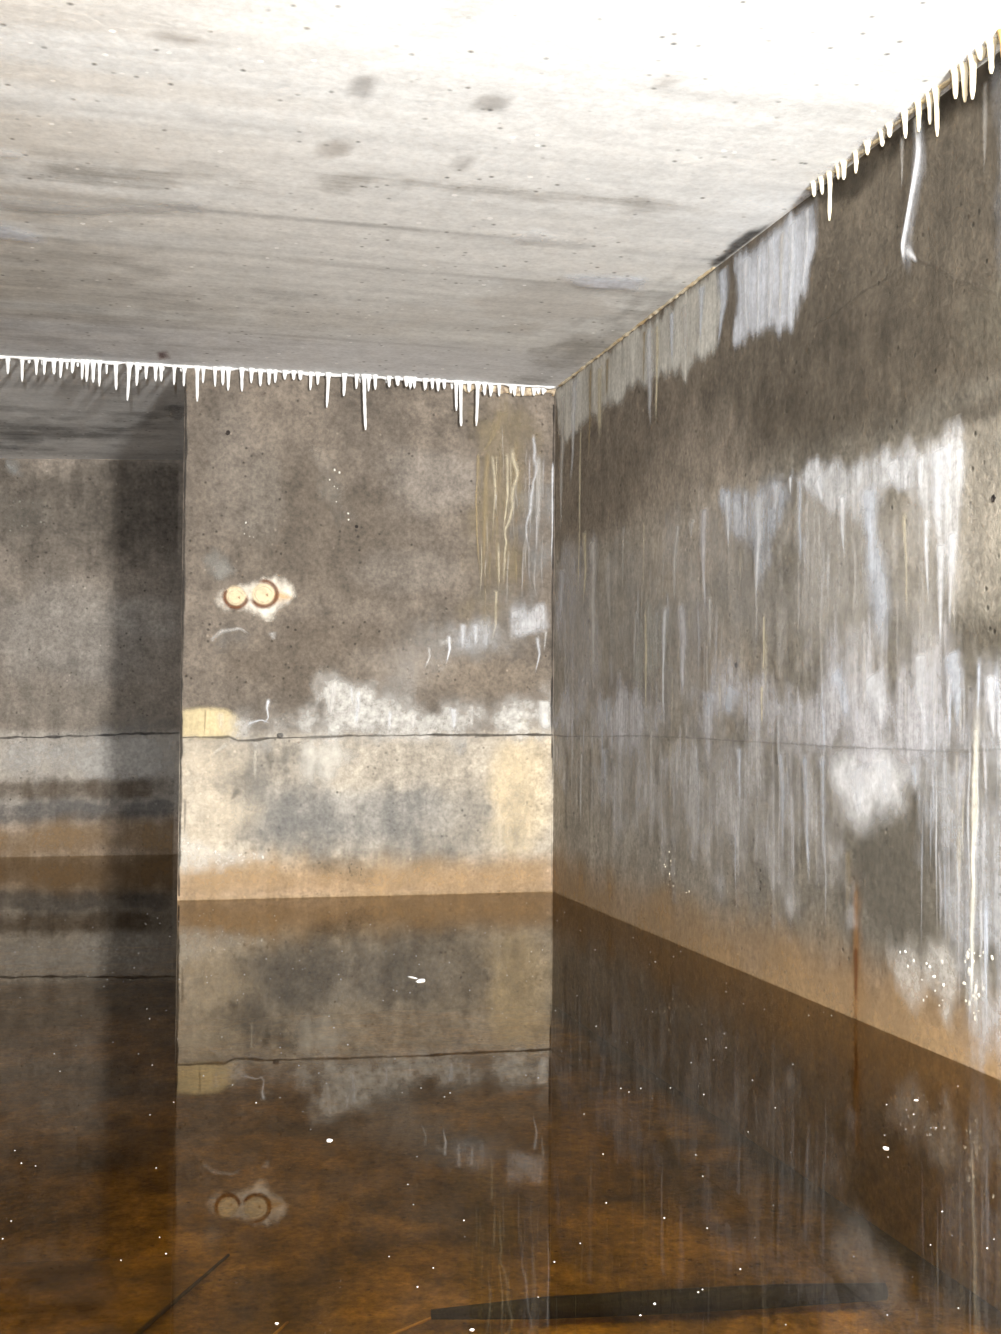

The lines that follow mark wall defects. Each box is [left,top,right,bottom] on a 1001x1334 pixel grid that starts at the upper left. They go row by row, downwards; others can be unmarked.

damp [978,42,1001,88]
damp [806,78,957,260]
damp [0,355,80,363]
damp [102,209,815,667]
rust [221,578,293,618]
damp [789,439,963,628]
damp [303,681,465,778]
damp [495,607,710,841]
damp [705,618,958,859]
damp [978,668,1001,728]
damp [636,851,741,971]
damp [759,740,1001,1080]